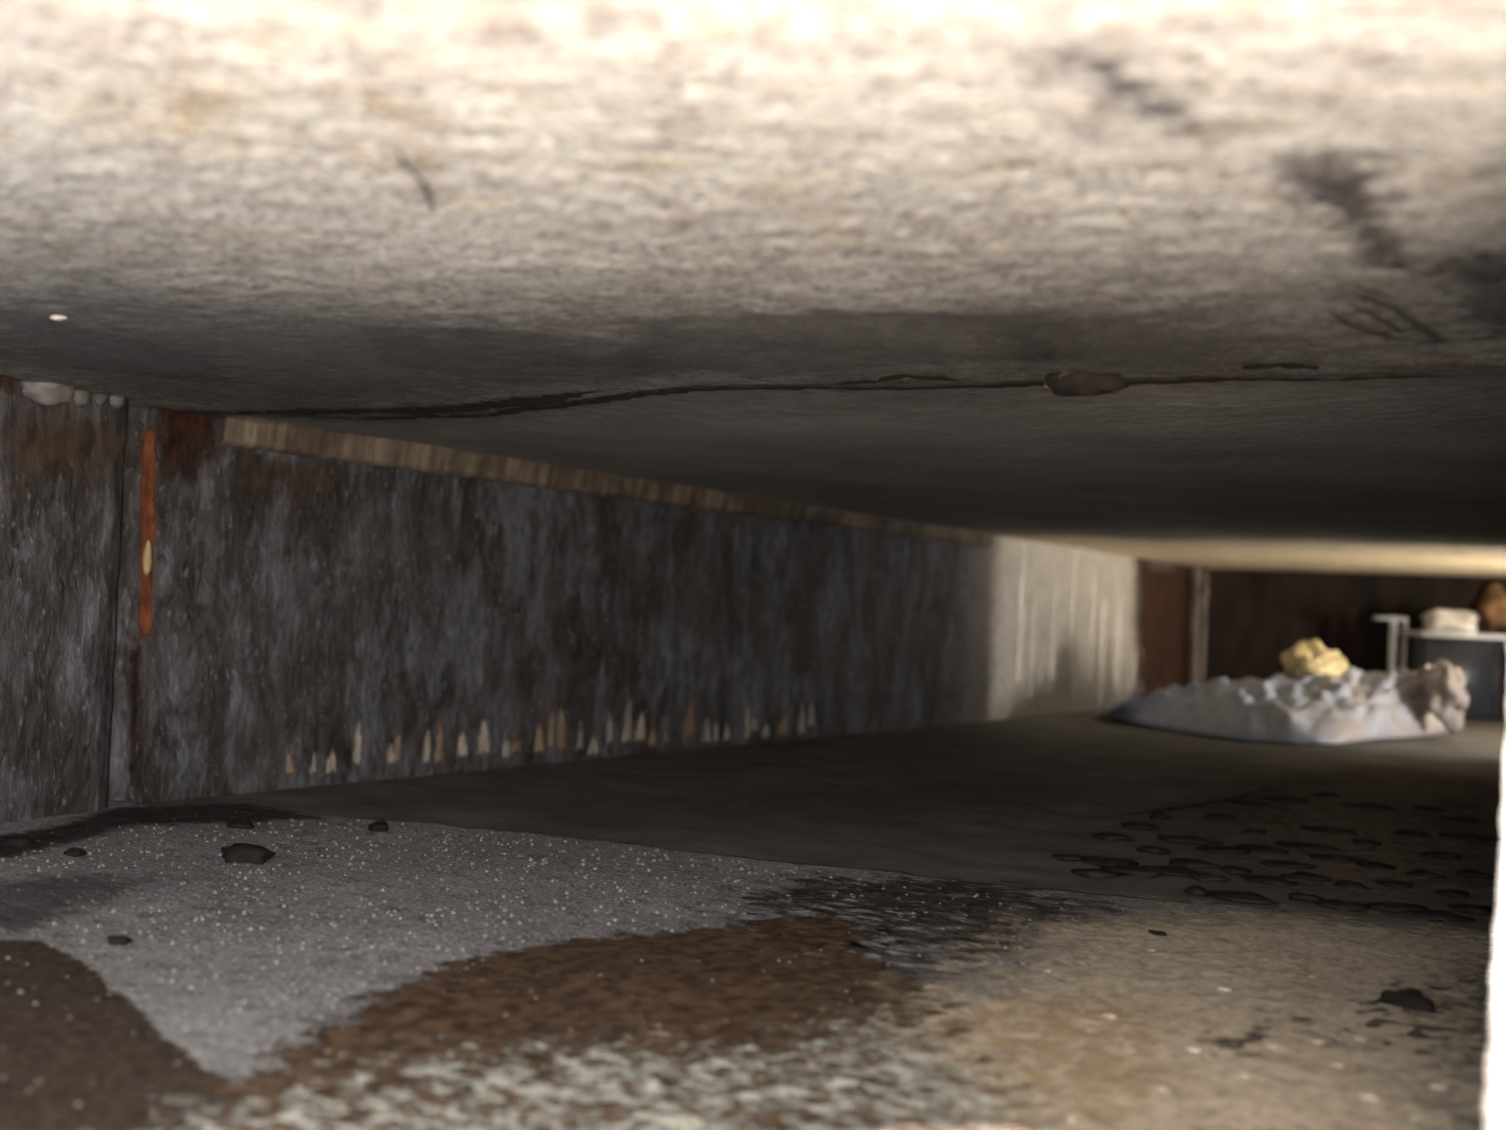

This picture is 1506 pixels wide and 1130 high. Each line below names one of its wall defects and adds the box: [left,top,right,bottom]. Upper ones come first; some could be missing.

crack [202,375,1044,420]
crack [1127,283,1506,385]
damp [1275,148,1506,340]
corrosion [128,407,223,771]